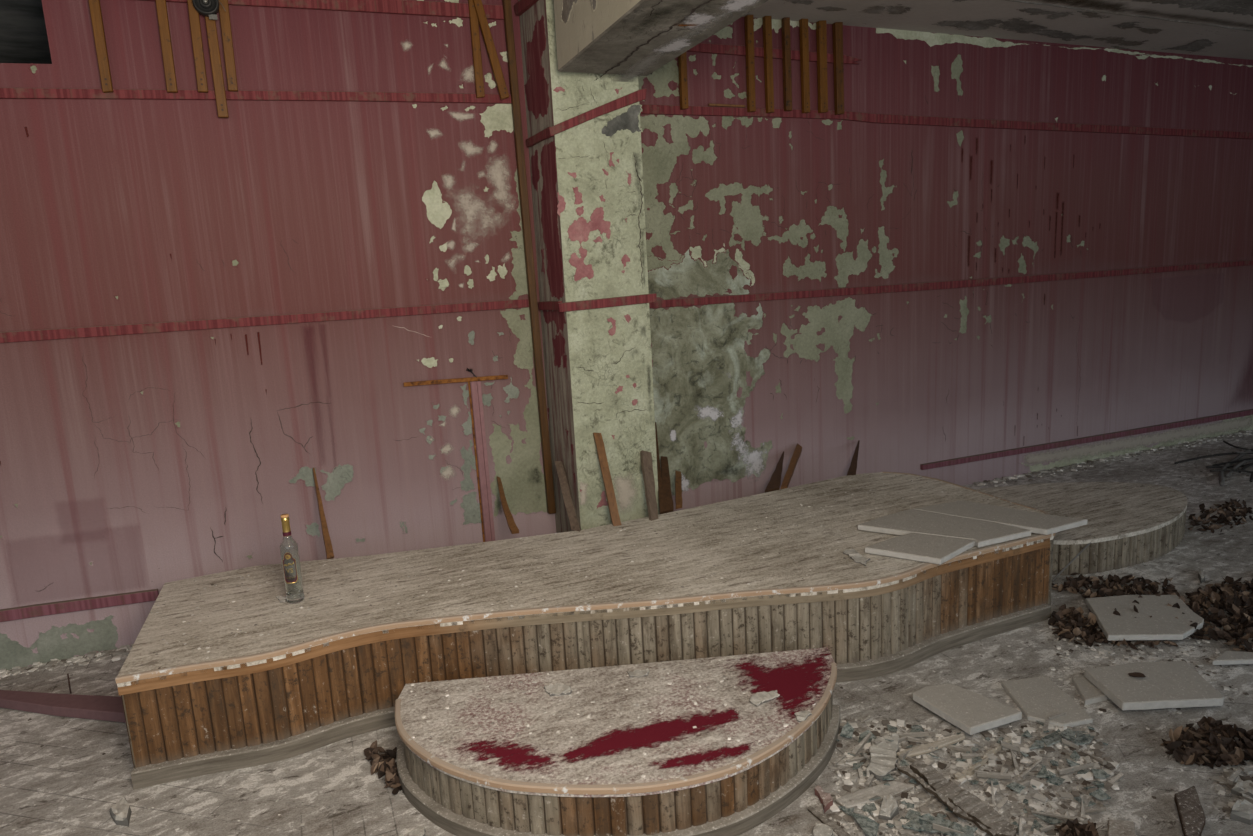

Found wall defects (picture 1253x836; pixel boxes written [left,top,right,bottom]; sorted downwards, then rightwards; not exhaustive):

peeling [422,0,465,29]
peeling [524,15,565,92]
peeling [753,0,846,45]
peeling [1114,0,1253,17]
peeling [464,71,514,139]
peeling [420,179,454,293]
peeling [600,22,900,415]
peeling [998,234,1040,303]
peeling [415,355,455,370]
peeling [437,314,476,346]
peeling [458,140,610,526]
crack [249,402,329,501]